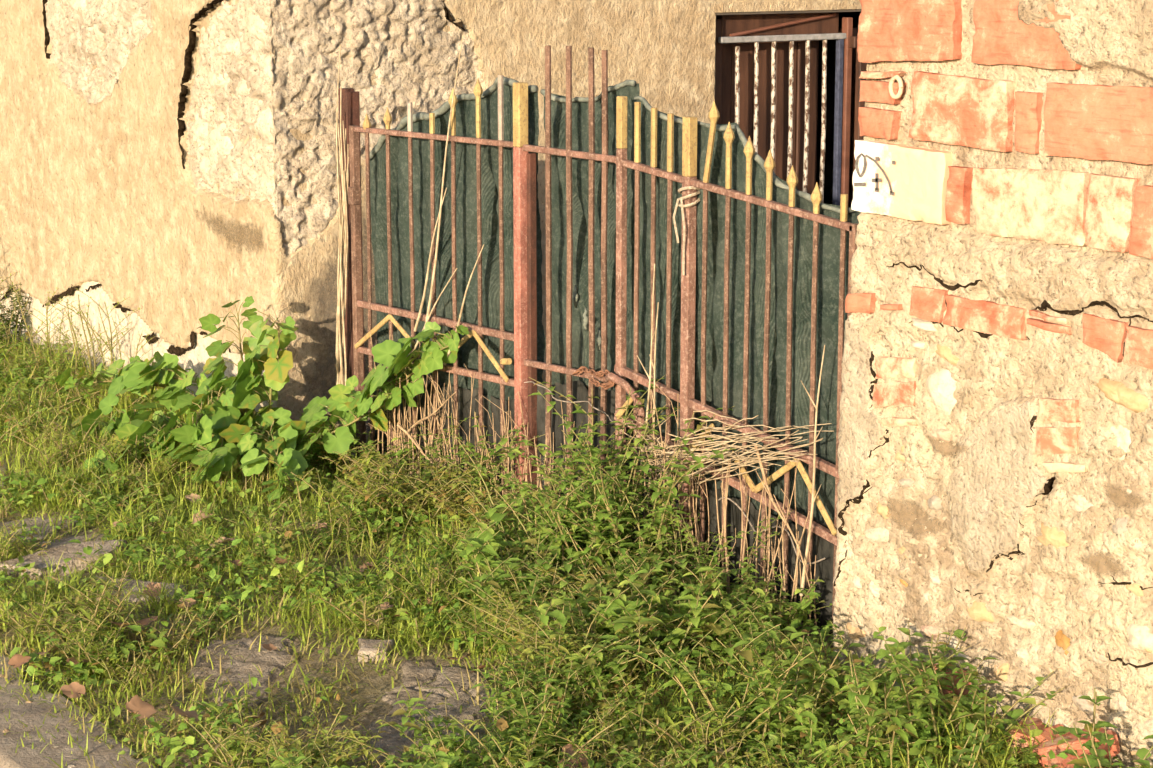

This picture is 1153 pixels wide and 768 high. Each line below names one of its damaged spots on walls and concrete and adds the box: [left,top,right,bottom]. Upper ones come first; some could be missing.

flaking render [45,0,153,105]
crack [442,0,466,31]
flaking render [185,0,484,255]
flaking render [851,0,1153,259]
flaking render [0,281,245,397]
crack [888,262,993,338]
crack [834,351,890,586]
crack [1029,416,1037,433]
crack [954,477,1055,596]